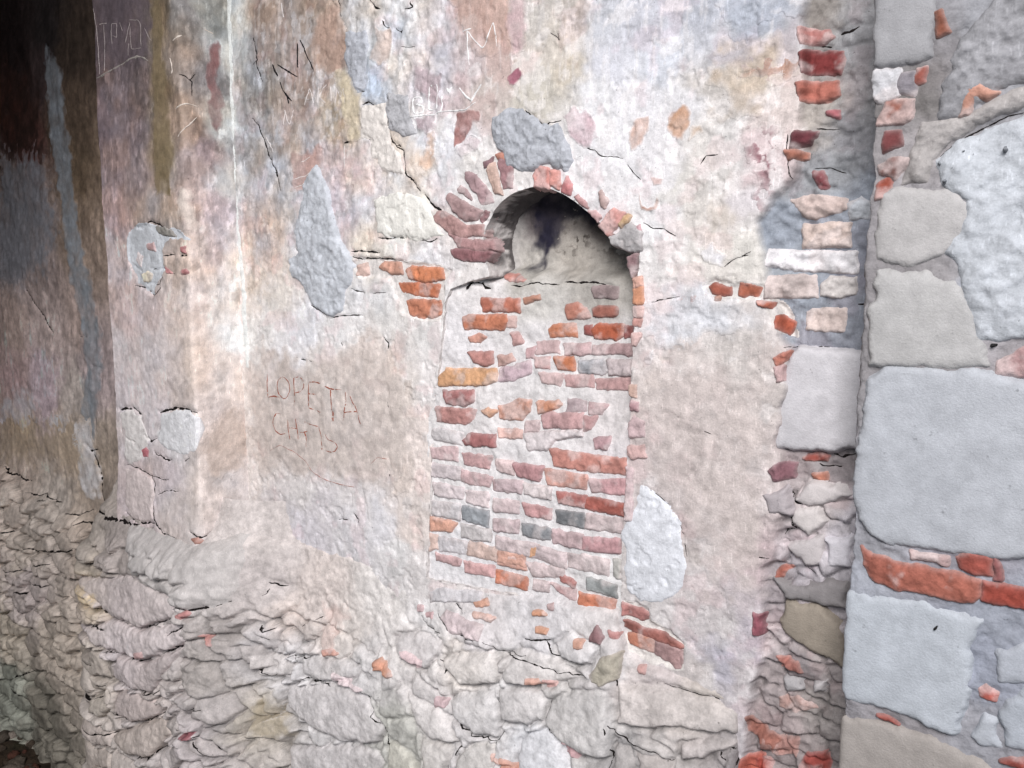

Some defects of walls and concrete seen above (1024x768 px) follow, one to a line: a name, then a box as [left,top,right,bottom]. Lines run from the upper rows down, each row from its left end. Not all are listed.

flaking render [794,25,847,120]
crack [252,118,281,190]
crack [344,91,442,211]
flaking render [127,186,204,295]
flaking render [374,192,445,242]
flaking render [353,257,452,323]
flaking render [702,130,871,667]
crack [1,407,207,595]
crack [422,603,586,678]
flaking render [621,600,686,671]
flaking render [776,655,830,713]
flaking render [738,714,833,768]